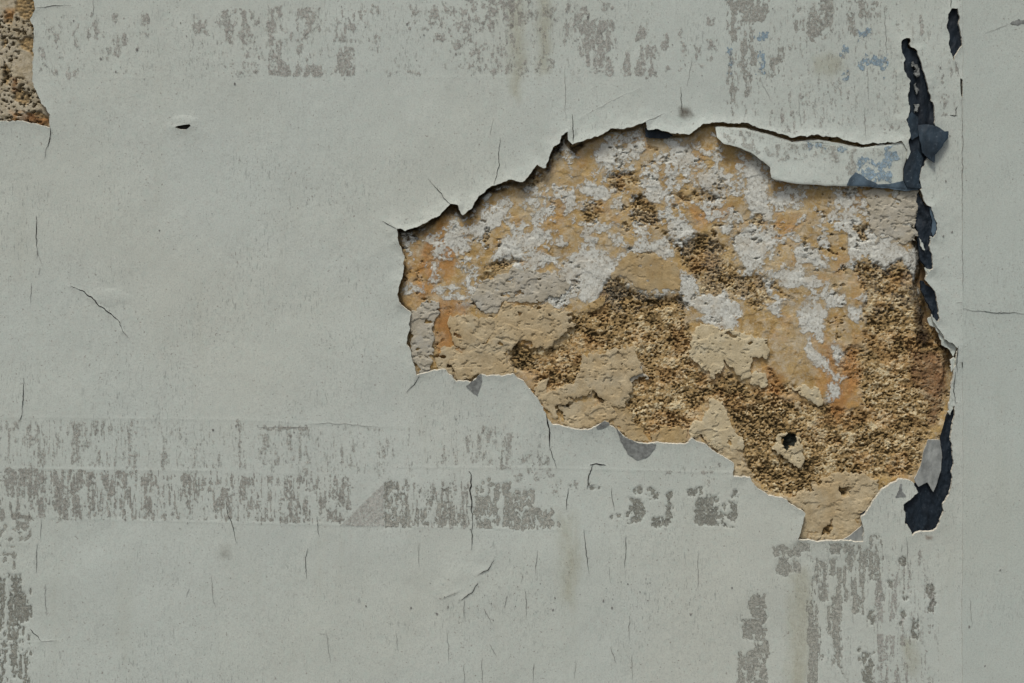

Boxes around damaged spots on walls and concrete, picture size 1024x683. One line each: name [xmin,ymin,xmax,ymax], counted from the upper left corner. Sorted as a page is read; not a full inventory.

spalling [0,0,138,127]
crack [74,287,130,339]
spalling [397,0,962,683]